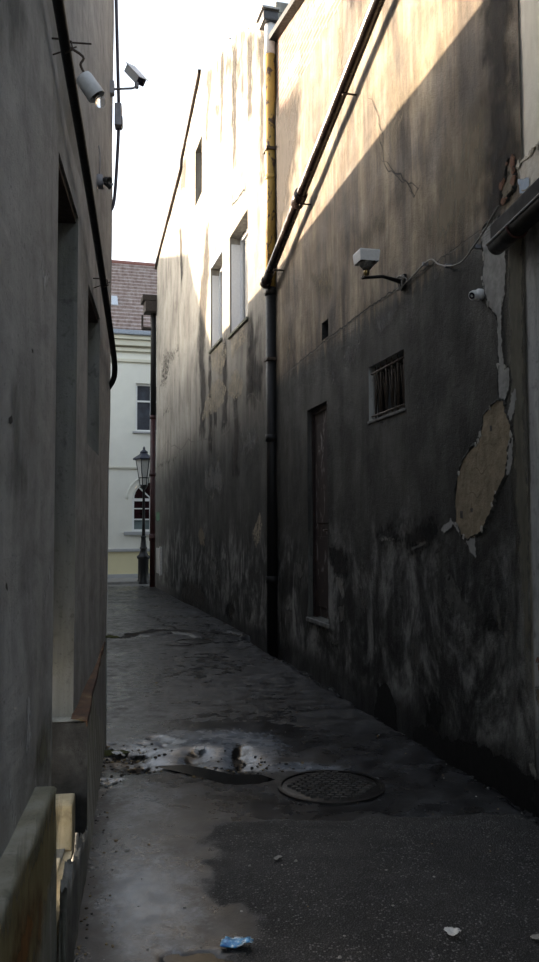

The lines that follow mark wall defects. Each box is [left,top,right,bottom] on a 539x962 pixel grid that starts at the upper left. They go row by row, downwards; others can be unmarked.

water stain [220,36,299,243]
crack [368,98,420,197]
water stain [389,75,416,140]
water stain [429,0,519,245]
water stain [198,221,263,492]
peeling [441,141,539,558]